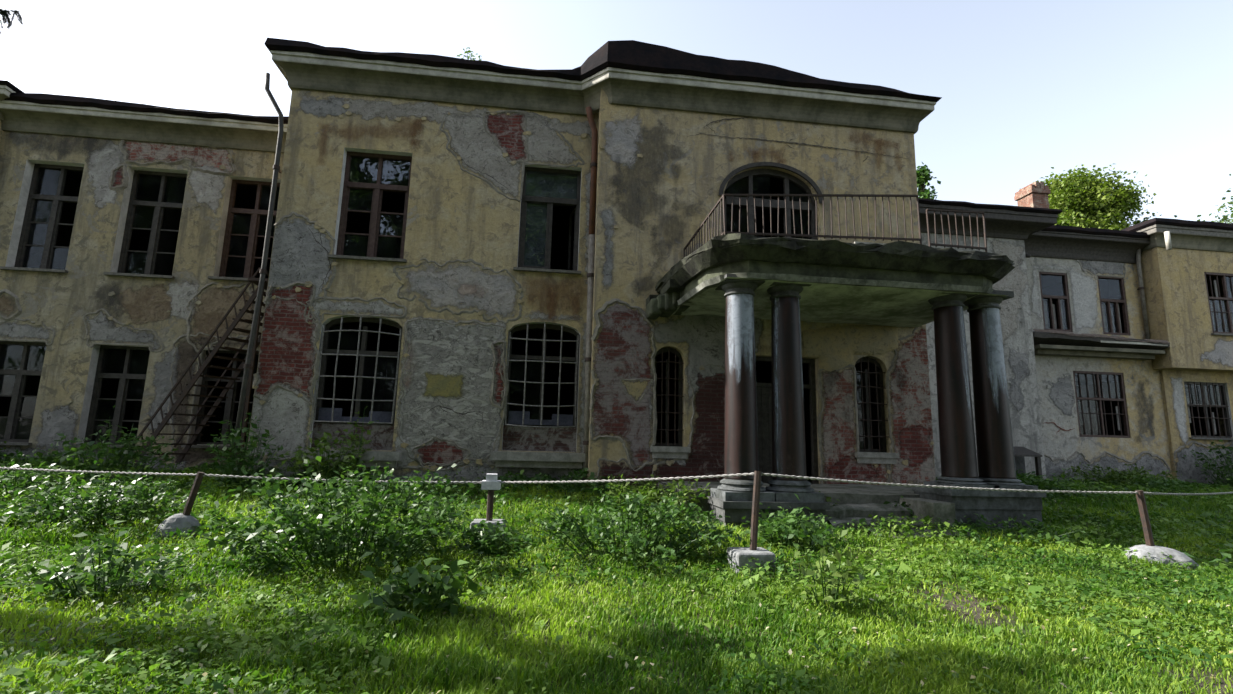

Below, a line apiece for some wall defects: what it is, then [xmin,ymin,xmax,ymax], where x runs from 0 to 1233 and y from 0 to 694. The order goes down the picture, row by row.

peeling [0,91,778,493]
spalling [818,324,936,485]
peeling [1201,339,1233,367]